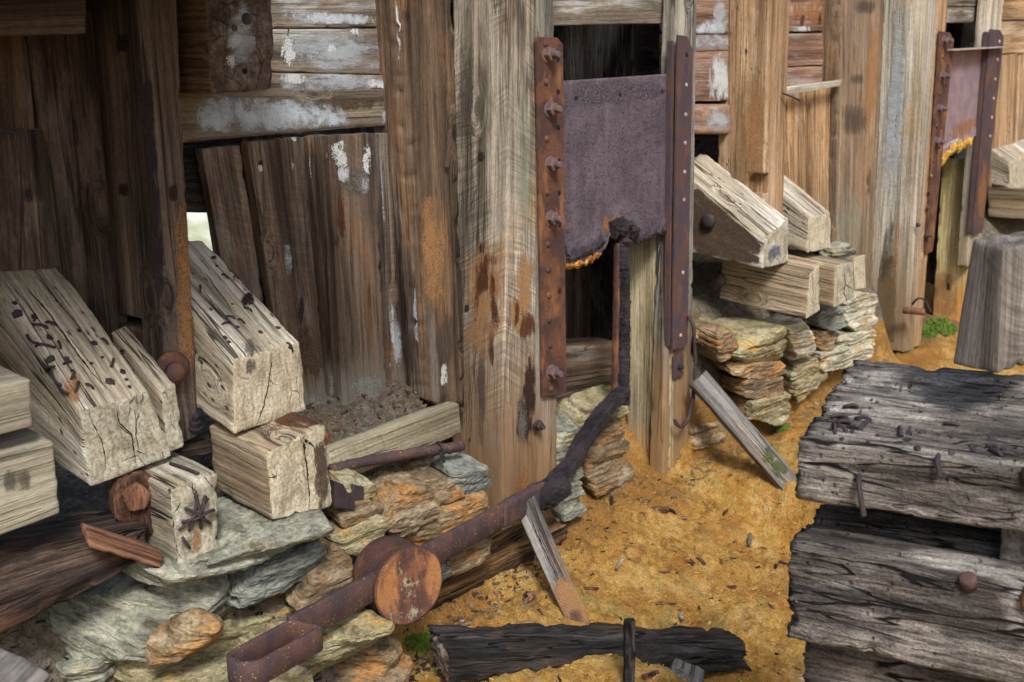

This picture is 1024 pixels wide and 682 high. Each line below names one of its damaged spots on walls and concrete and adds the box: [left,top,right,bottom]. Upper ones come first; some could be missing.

damp [196,9,385,141]
damp [696,3,729,126]
damp [331,140,383,238]
rust [941,118,977,166]
rust [977,164,987,221]